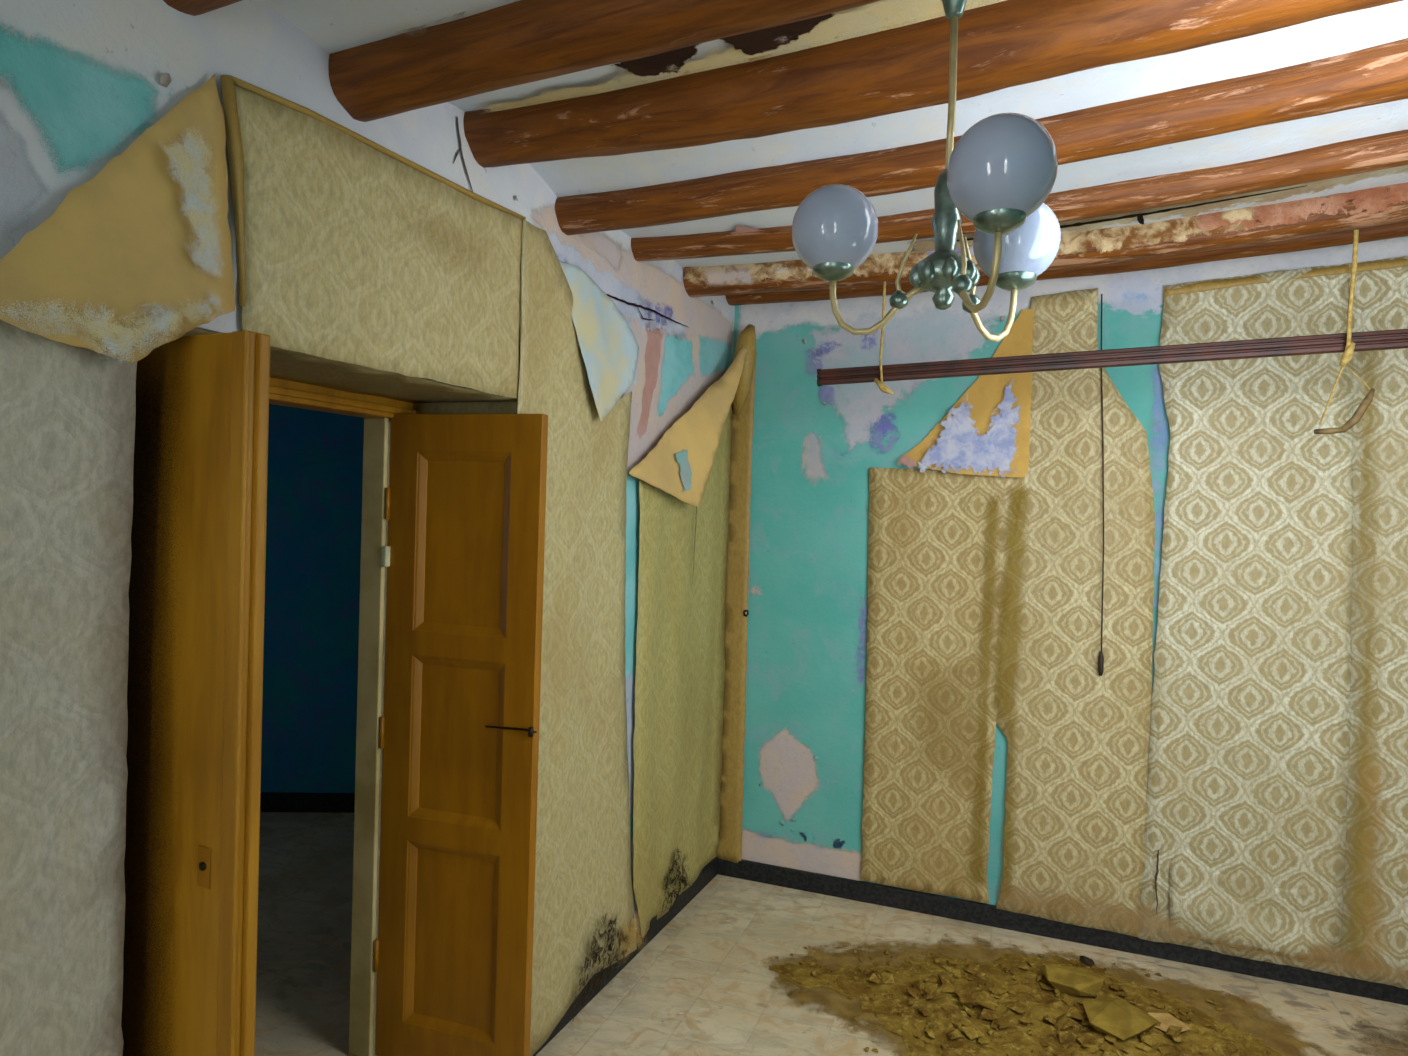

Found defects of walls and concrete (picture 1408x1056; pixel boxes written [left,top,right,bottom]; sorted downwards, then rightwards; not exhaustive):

peeling [481,0,946,113]
peeling [964,0,1006,11]
peeling [514,195,1408,840]
spalling [741,728,862,881]
damp [569,844,690,1029]